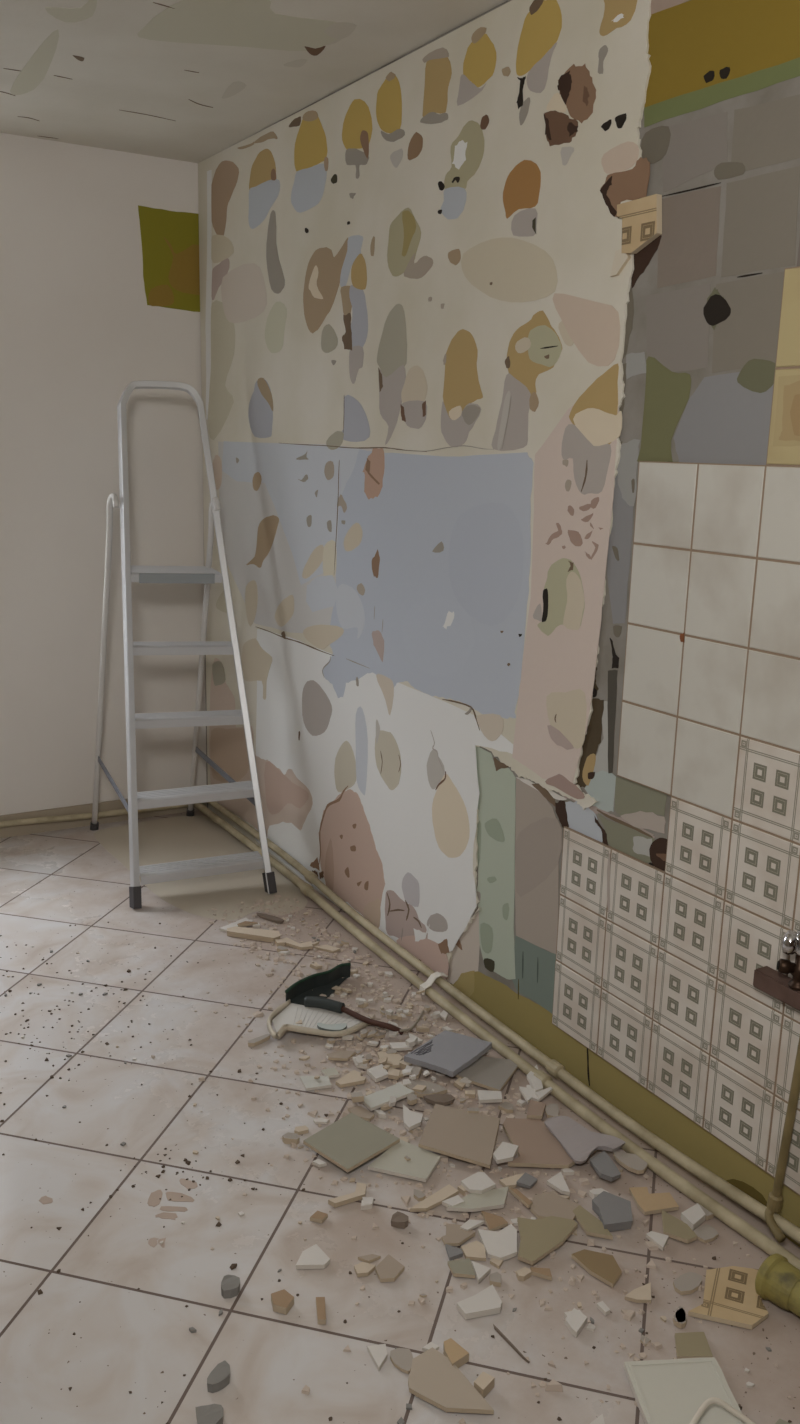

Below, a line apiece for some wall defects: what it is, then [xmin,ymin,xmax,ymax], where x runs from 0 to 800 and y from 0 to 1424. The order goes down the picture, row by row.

peeling [211,0,637,294]
spalling [600,157,650,218]
peeling [248,378,273,438]
peeling [296,208,483,499]
peeling [492,310,562,451]
spalling [631,235,662,288]
spalling [703,288,731,330]
peeling [246,515,279,568]
peeling [533,364,619,636]
spalling [310,630,462,980]
peeling [427,750,470,858]
peeling [516,667,604,828]